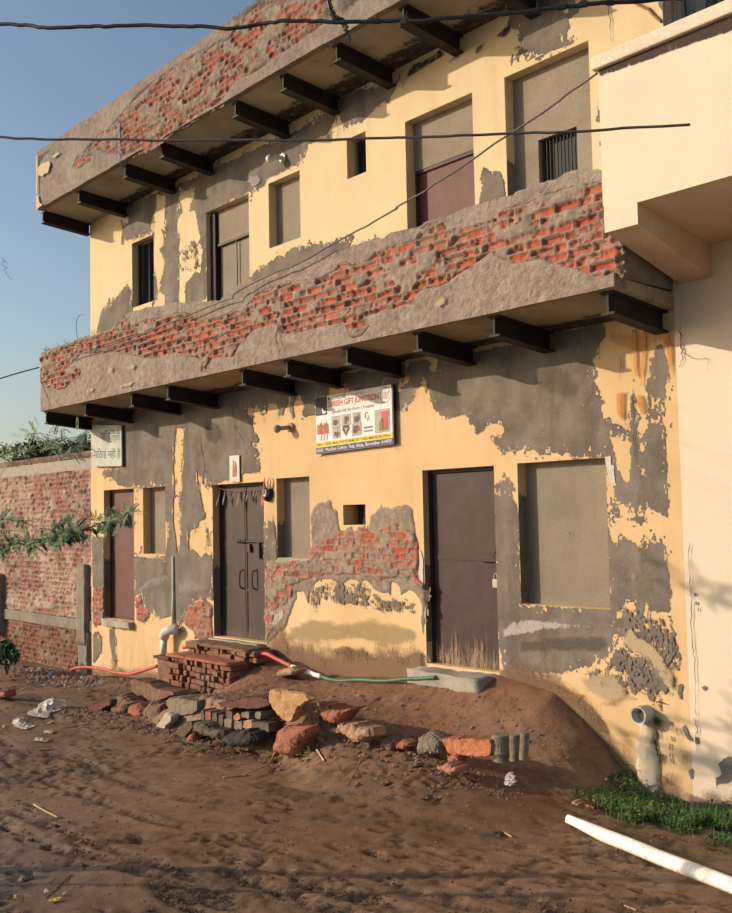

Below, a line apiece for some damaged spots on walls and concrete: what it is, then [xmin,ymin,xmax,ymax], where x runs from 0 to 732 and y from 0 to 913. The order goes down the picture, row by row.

flaking render [73,0,330,169]
flaking render [507,0,587,65]
flaking render [39,74,625,391]
crack [679,327,709,369]
flaking render [96,381,329,640]
flaking render [263,500,432,662]
flaking render [341,323,683,711]
crack [688,544,698,752]
flaking render [716,756,732,787]